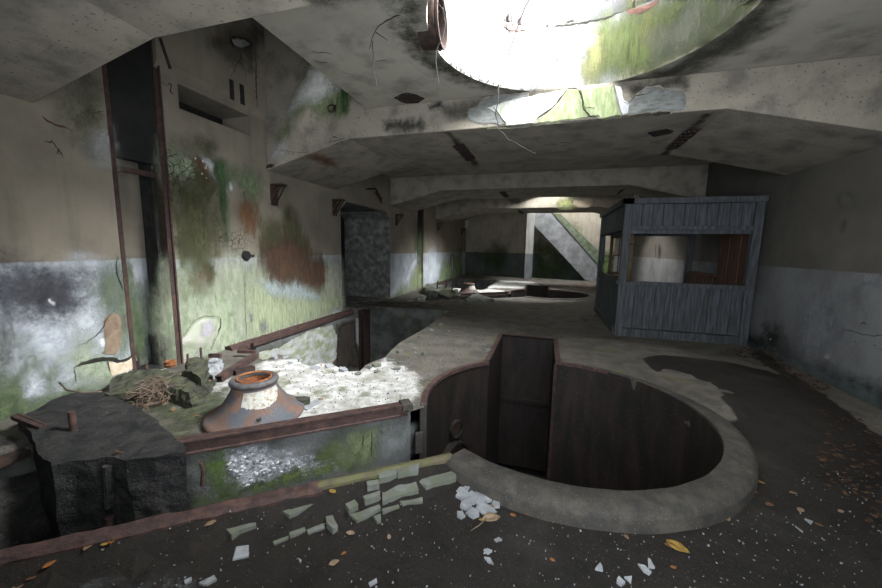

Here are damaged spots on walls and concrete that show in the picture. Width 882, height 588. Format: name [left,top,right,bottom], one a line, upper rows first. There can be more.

crack [538,88,601,118]
water stain [167,150,233,295]
corrosion [240,203,325,295]
water stain [0,266,105,395]
flaking render [103,313,138,376]